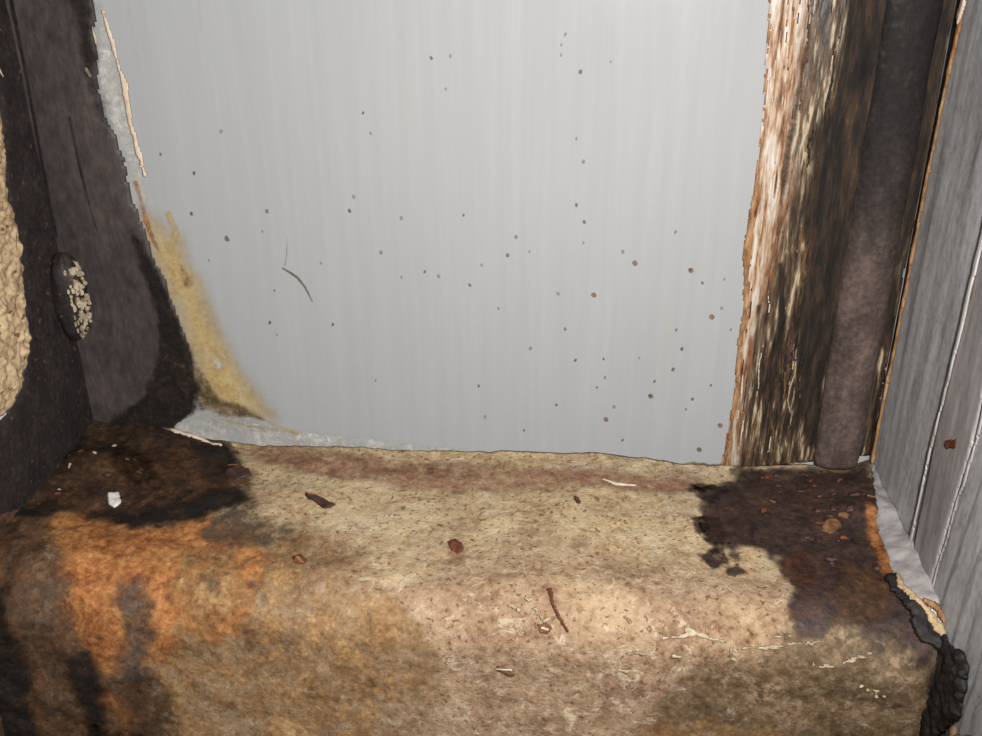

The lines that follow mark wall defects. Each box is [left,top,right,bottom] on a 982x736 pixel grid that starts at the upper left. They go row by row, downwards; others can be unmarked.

peeling [85,10,157,248]
damp [766,0,887,446]
damp [880,0,960,375]
damp [16,213,296,546]
damp [0,586,36,736]
damp [69,651,142,736]
damp [117,581,155,683]